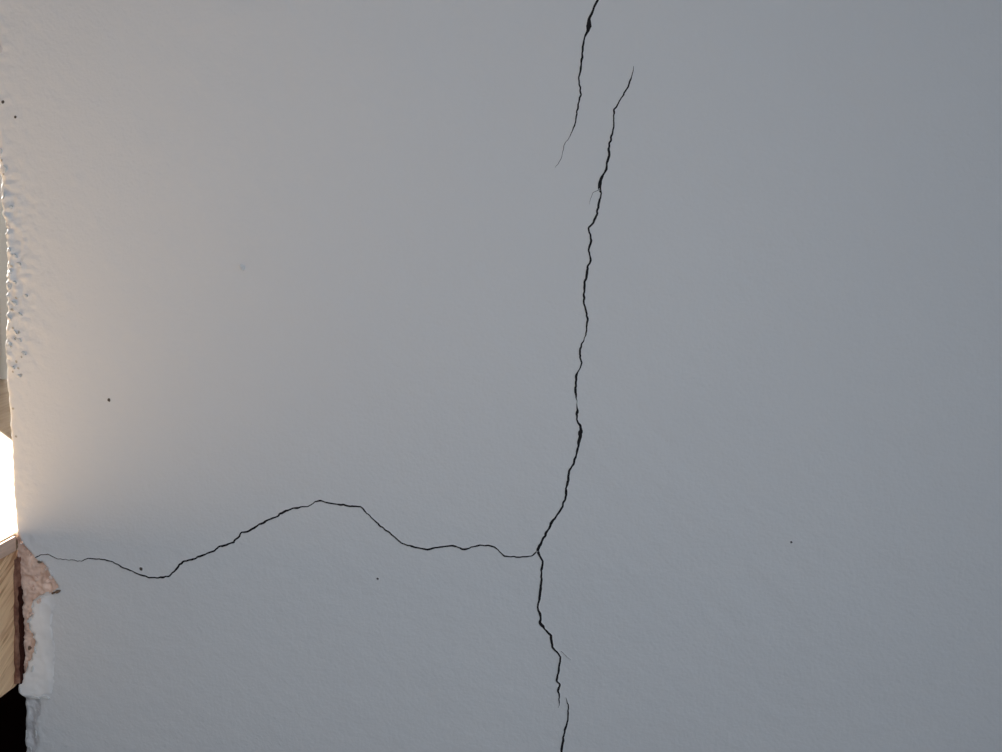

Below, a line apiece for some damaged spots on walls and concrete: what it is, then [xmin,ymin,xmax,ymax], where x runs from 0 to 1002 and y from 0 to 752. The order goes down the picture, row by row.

crack [554,0,600,168]
crack [35,66,635,752]
spalling [16,533,61,672]
spalling [18,687,41,752]